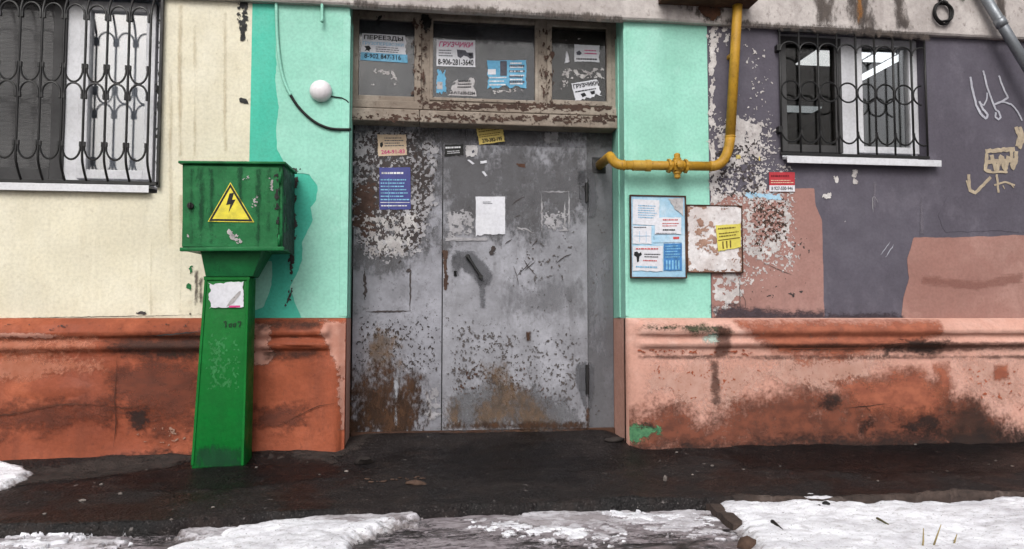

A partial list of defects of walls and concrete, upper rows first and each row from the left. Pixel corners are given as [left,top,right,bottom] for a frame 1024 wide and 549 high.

peeling [352,17,617,290]
peeling [698,6,810,316]
crack [0,361,149,447]
damp [0,332,343,490]
corrosion [349,328,430,437]
corrosion [444,408,589,430]
damp [629,303,1024,473]